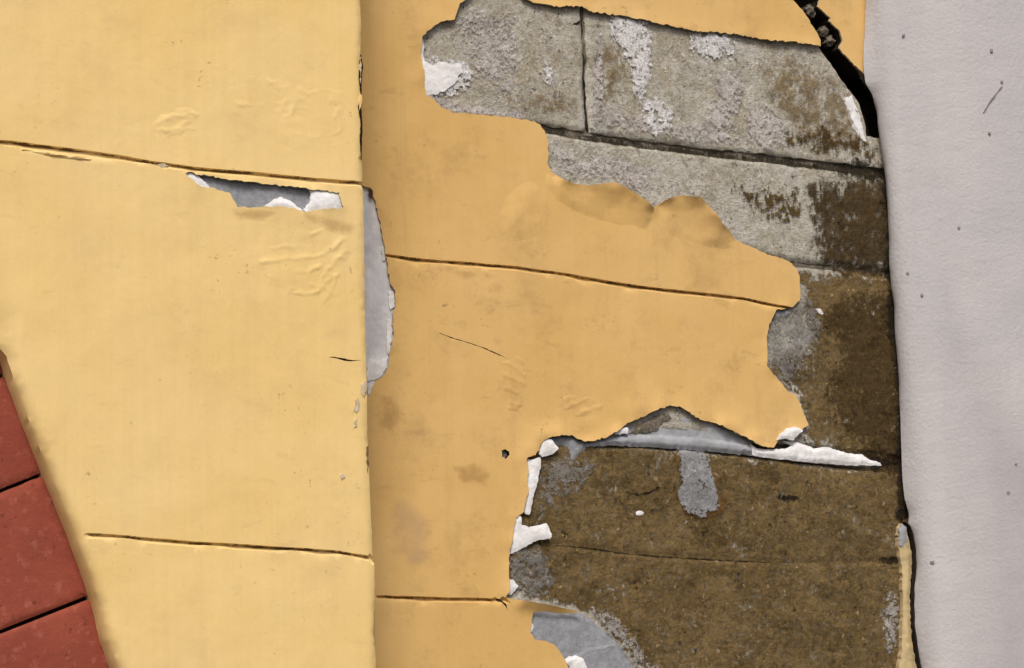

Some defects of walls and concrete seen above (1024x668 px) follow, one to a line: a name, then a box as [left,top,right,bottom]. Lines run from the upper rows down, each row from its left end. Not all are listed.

crack [793,0,880,138]
peeling [186,172,342,212]
peeling [354,186,395,427]
peeling [421,0,907,668]
leakage [509,14,909,668]